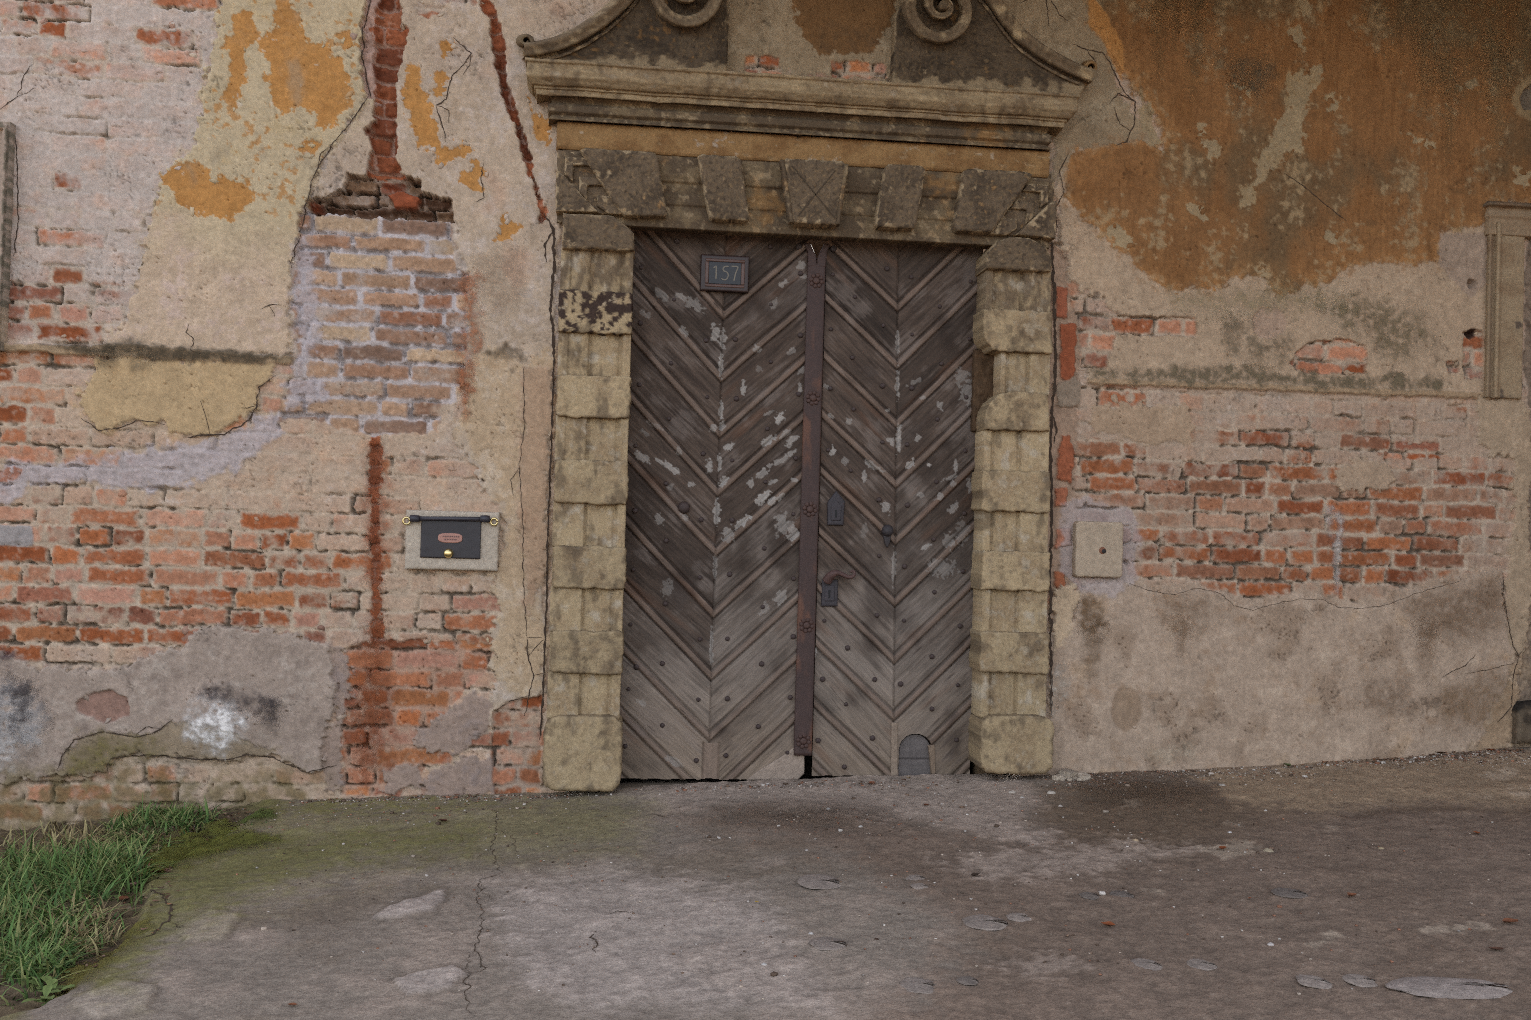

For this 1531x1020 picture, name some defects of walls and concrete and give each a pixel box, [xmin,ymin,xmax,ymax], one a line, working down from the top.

flaking render [0,0,123,75]
peeling [221,0,357,159]
peeling [401,37,489,193]
crack [436,37,472,142]
peeling [159,160,256,224]
spalling [309,177,455,224]
flaking render [8,254,126,340]
flaking render [1056,287,1198,408]
flaking render [1054,435,1518,608]
flaking render [0,492,546,799]
leakage [0,685,41,760]
leakage [184,688,274,752]